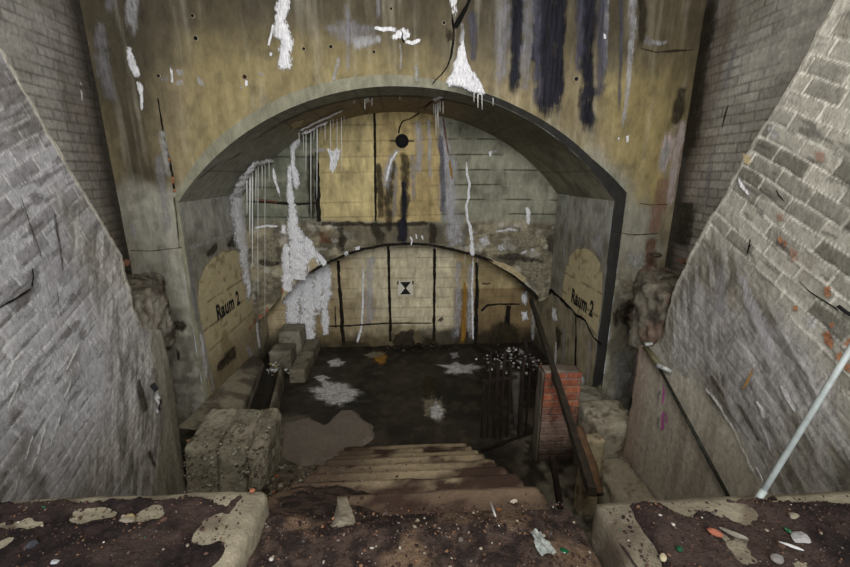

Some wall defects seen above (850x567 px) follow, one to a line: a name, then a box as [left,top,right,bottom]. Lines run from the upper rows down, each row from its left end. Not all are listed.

efflorescence [268,0,294,69]
crack [398,0,477,133]
efflorescence [446,31,494,102]
water stain [510,0,566,115]
water stain [575,0,609,129]
water stain [619,0,646,118]
spalling [255,225,288,301]
water stain [230,139,332,340]
water stain [371,117,490,342]
water stain [491,291,535,343]
spalling [479,228,554,293]
crack [549,288,602,366]